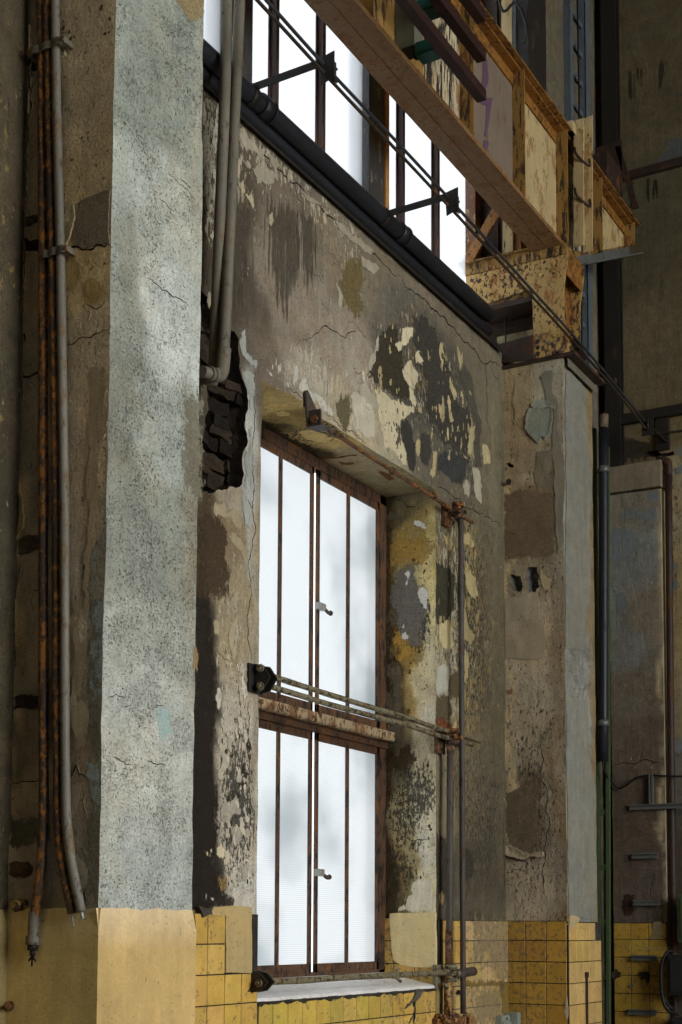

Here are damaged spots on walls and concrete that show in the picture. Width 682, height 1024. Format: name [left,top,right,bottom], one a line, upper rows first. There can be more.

spalling [200,284,212,366]
spalling [201,329,333,565]
leakage [234,194,318,323]
crack [296,304,366,345]
peeling [342,324,491,503]
flaking render [508,371,592,650]
peeling [390,513,479,731]
leakage [192,796,235,908]
peeling [206,591,252,888]
peeling [386,763,444,913]
crack [502,728,555,909]
flaking render [565,697,597,919]